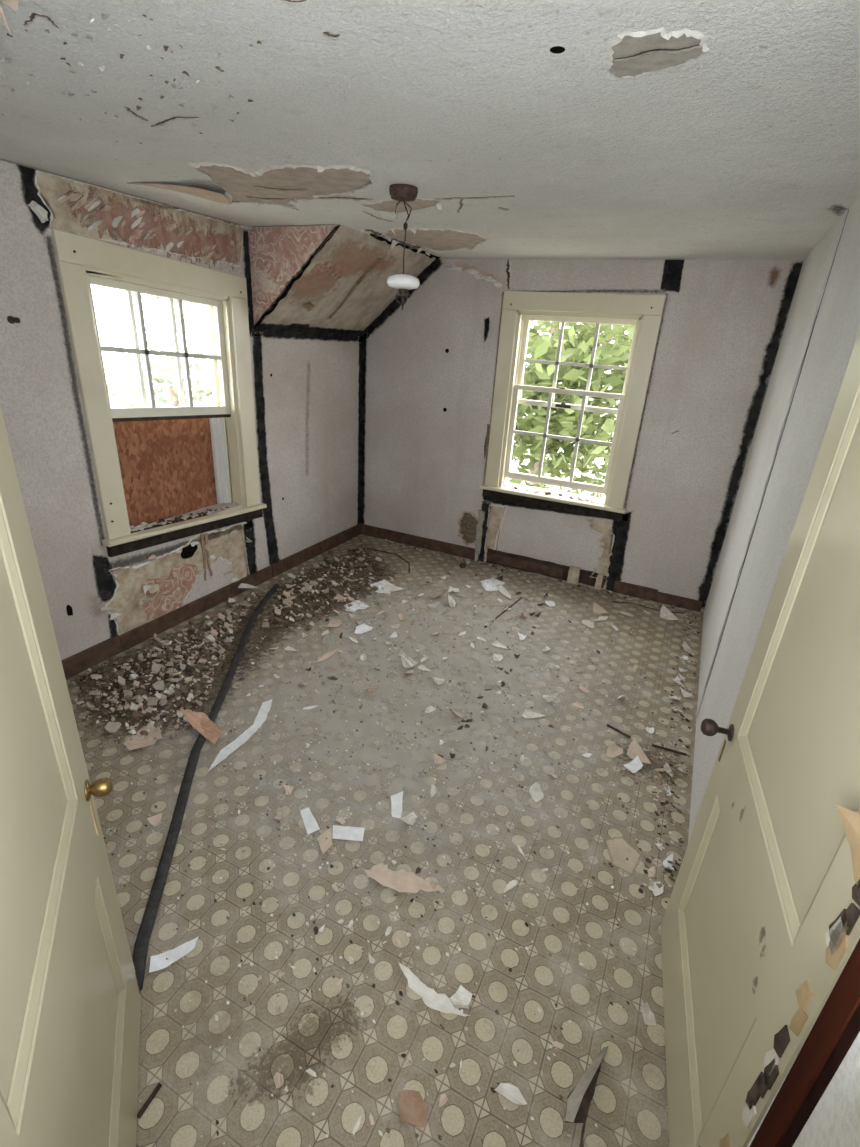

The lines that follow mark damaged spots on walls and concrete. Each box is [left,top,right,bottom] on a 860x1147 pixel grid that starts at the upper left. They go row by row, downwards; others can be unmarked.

peeling [0,0,203,134]
peeling [128,162,489,253]